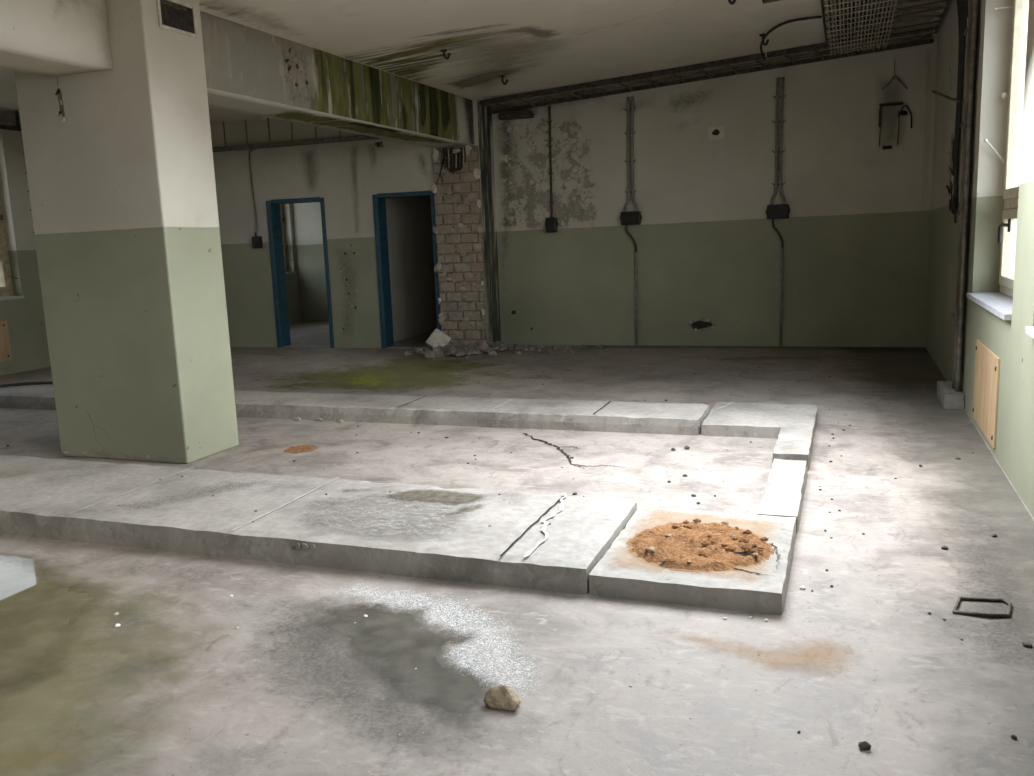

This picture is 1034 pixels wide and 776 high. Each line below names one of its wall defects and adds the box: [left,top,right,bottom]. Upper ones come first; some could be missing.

peeling [497,119,596,228]
flaking render [432,145,487,348]
flaking render [688,318,716,332]
corrosion [284,445,317,454]
crack [522,433,620,467]
crack [500,493,567,557]
leakage [196,582,551,738]